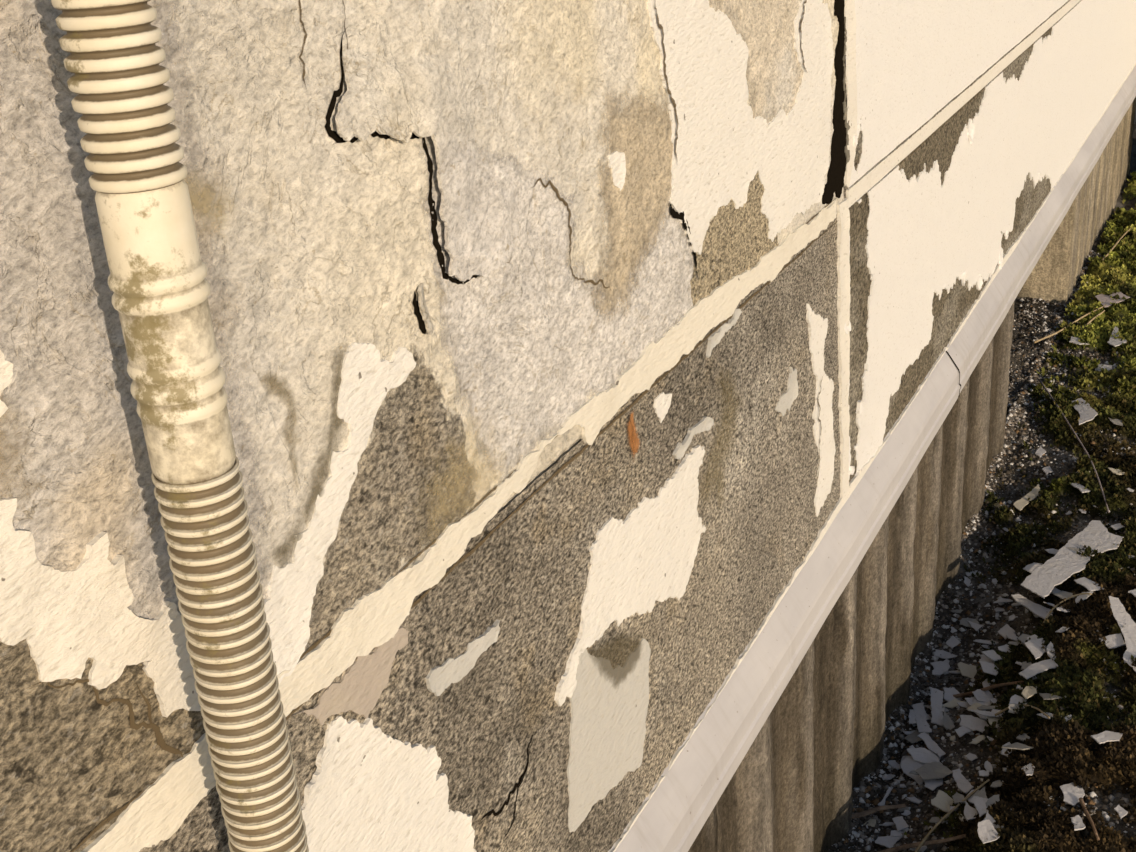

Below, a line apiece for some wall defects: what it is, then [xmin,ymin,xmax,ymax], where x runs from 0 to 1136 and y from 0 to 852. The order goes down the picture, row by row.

peeling [147,0,234,354]
crack [299,0,610,335]
peeling [710,0,803,124]
crack [799,0,850,204]
peeling [891,85,987,186]
peeling [999,28,1052,82]
peeling [0,0,182,619]
peeling [883,173,1051,440]
peeling [286,94,872,852]
corrosion [628,413,640,453]
peeling [139,786,231,852]
crack [481,735,534,835]